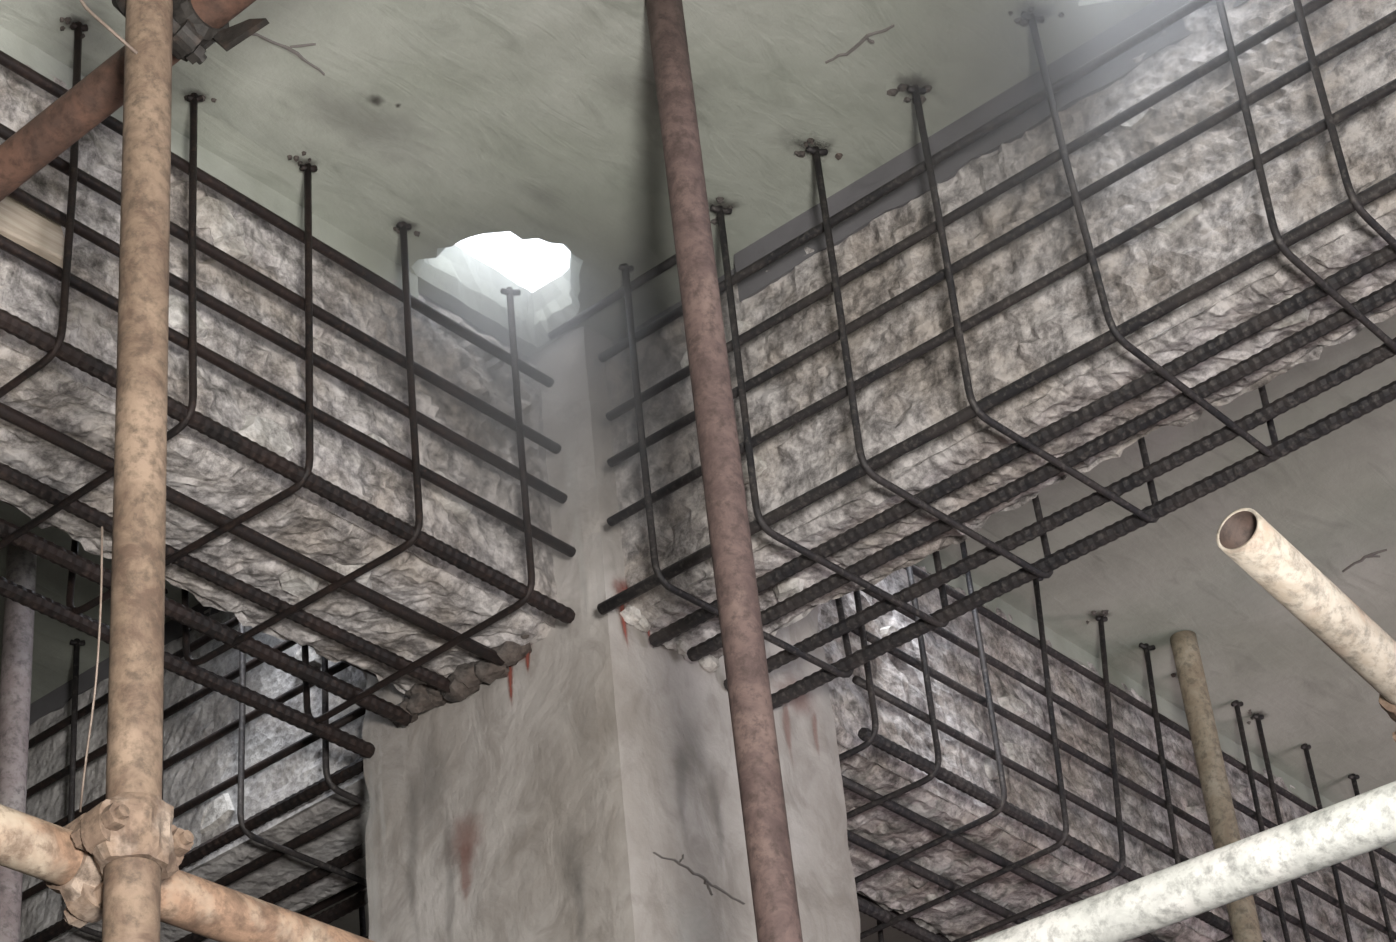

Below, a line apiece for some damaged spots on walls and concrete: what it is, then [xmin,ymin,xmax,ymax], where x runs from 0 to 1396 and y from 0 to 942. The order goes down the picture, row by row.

crack [825,24,895,64]
spalling [0,64,70,145]
spalling [287,151,313,166]
spalling [0,123,122,559]
spalling [605,315,723,673]
spalling [720,0,1396,942]
spalling [163,165,557,911]
corrosion [618,583,628,640]
spalling [26,678,109,827]
spalling [20,874,102,942]
spalling [160,922,218,942]
crack [653,852,745,905]